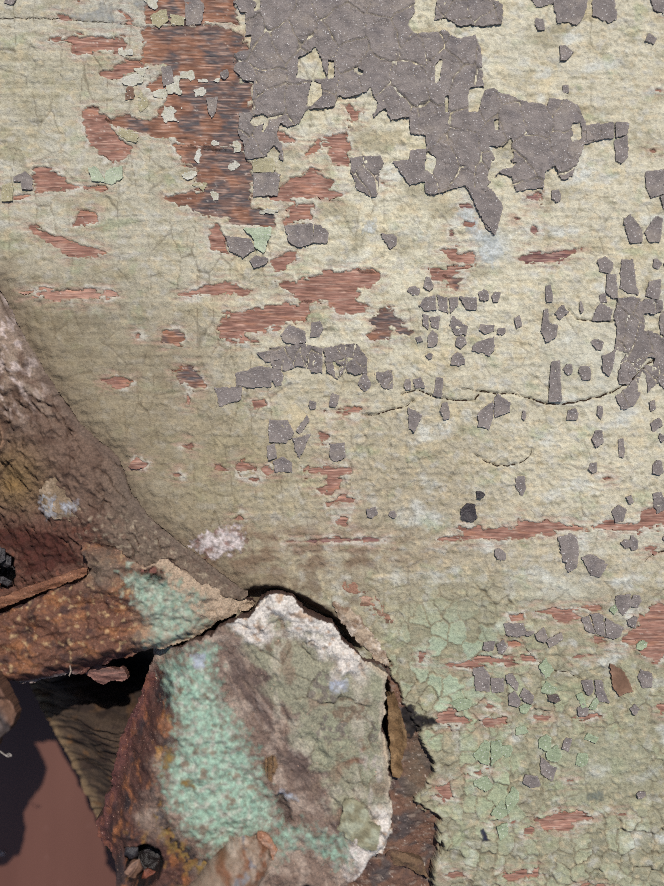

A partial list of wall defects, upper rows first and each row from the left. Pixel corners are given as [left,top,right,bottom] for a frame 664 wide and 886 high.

peeling [1,0,629,272]
peeling [623,169,664,244]
peeling [215,393,362,507]
peeling [172,230,522,407]
peeling [404,377,450,420]
peeling [477,394,511,430]
crack [371,360,654,416]
peeling [540,256,664,443]
peeling [437,491,664,577]
rust [0,527,256,684]
peeling [436,593,664,735]
peeling [490,734,592,841]